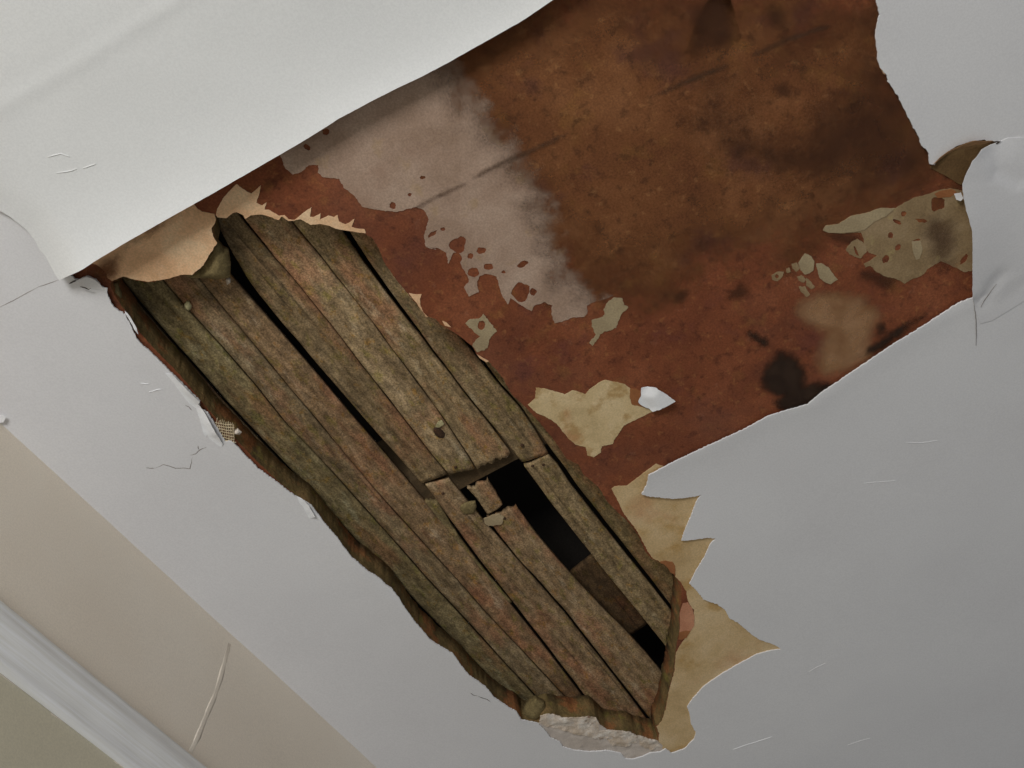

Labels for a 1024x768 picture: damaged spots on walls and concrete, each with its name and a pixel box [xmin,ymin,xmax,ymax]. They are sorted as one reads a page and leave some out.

crack [149,447,206,469]
flaking render [72,264,695,758]
flaking render [194,0,973,562]
water stain [451,0,924,296]
water stain [764,356,828,409]